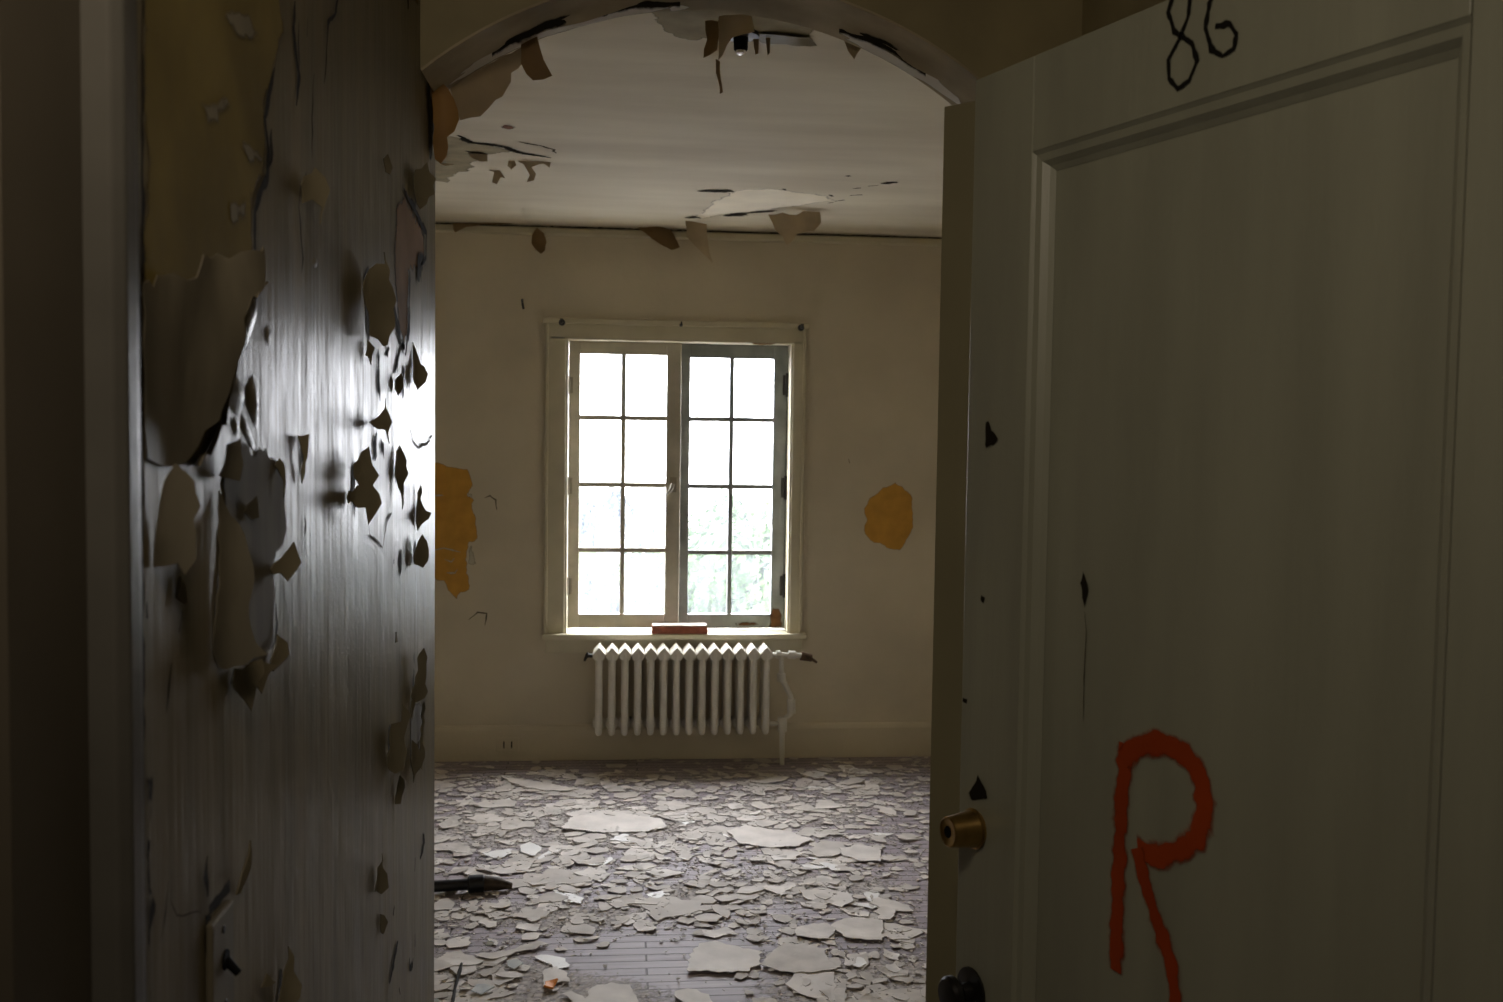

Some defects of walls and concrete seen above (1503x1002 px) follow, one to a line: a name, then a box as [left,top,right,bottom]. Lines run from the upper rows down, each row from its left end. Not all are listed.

peeling [839,11,961,104]
peeling [638,175,898,263]
peeling [347,0,817,599]
peeling [864,483,913,550]
peeling [204,841,252,949]
peeling [375,855,389,894]